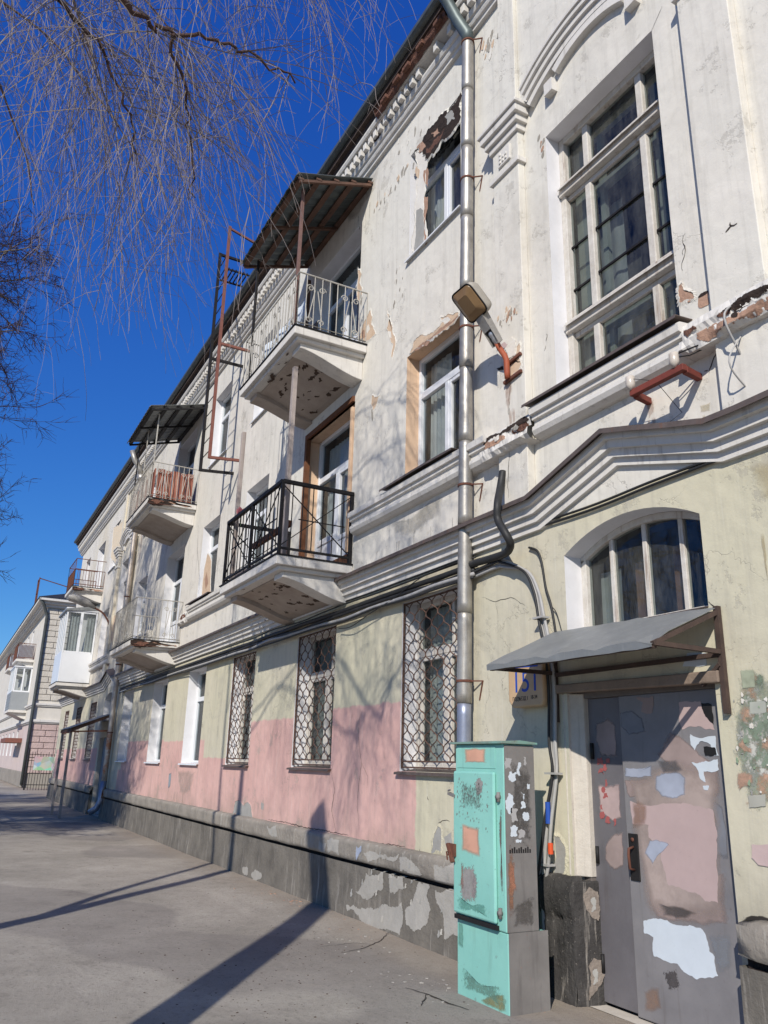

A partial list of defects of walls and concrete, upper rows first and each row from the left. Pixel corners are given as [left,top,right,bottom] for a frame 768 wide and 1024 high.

peeling [356,266,403,359]
spalling [675,280,709,308]
spalling [717,284,768,318]
spalling [409,311,460,354]
spalling [483,416,529,445]
spalling [242,867,262,881]
spalling [346,851,458,940]